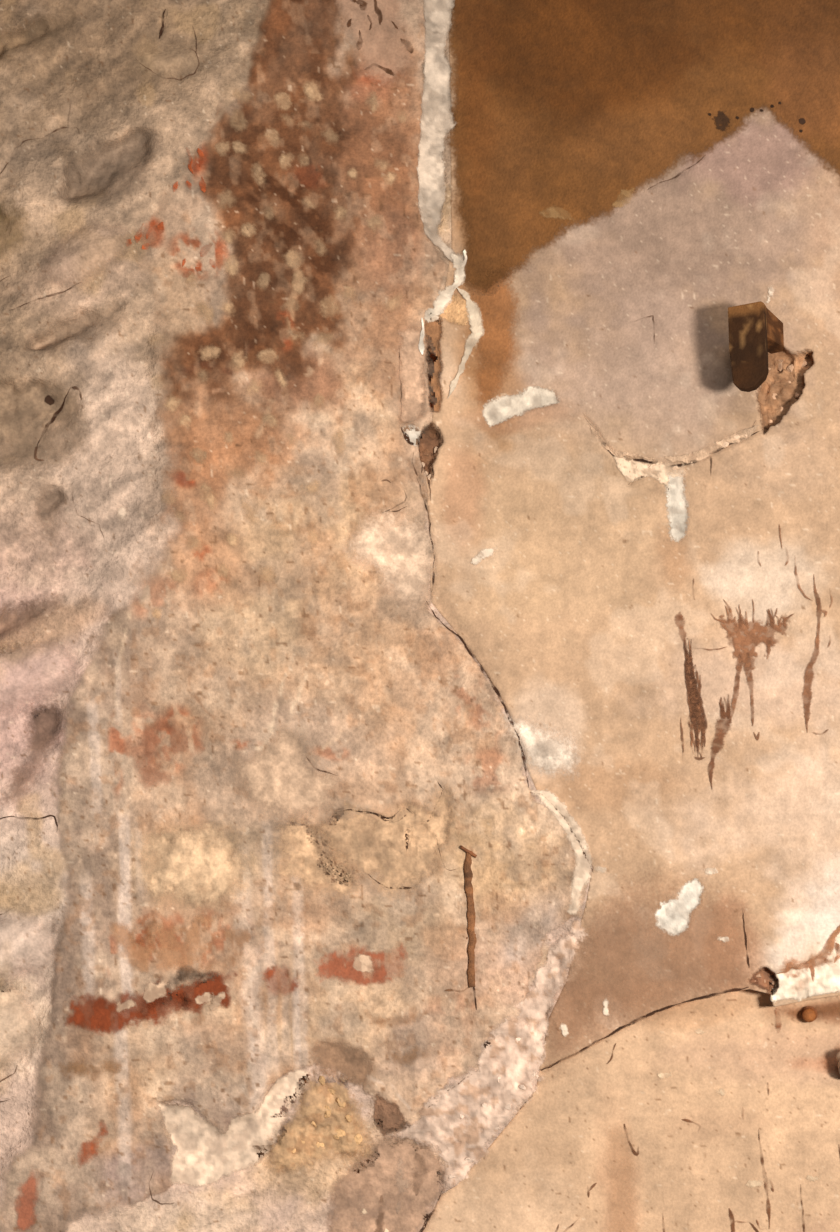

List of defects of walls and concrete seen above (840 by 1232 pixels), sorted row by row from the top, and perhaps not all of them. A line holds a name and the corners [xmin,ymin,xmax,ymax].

flaking render [339,0,484,480]
damp [448,0,840,402]
flaking render [483,386,559,427]
flaking render [591,349,814,542]
crack [382,427,531,793]
rust [676,599,795,787]
rust [785,562,833,733]
flaking render [237,727,453,894]
flaking render [158,790,603,1232]
crack [541,913,750,1071]
flaking render [749,932,840,1001]
rust [778,926,840,980]